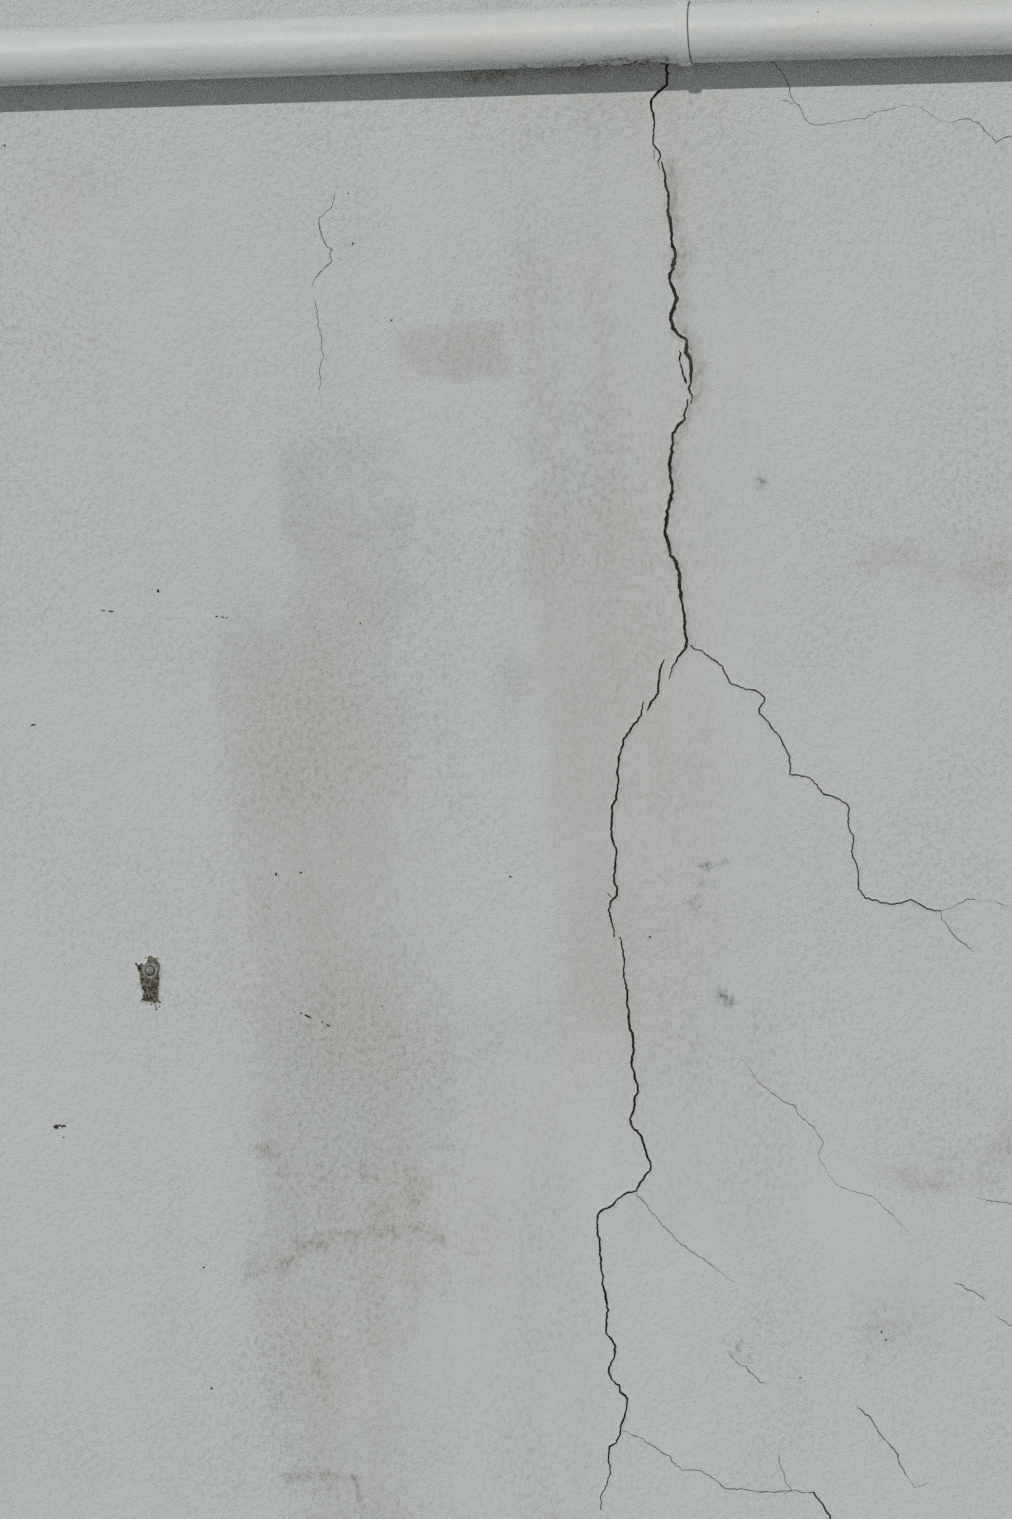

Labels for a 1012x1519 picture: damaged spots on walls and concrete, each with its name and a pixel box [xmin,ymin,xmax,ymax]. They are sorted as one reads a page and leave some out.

spalling [134,953,163,1010]
crack [593,61,1011,1519]